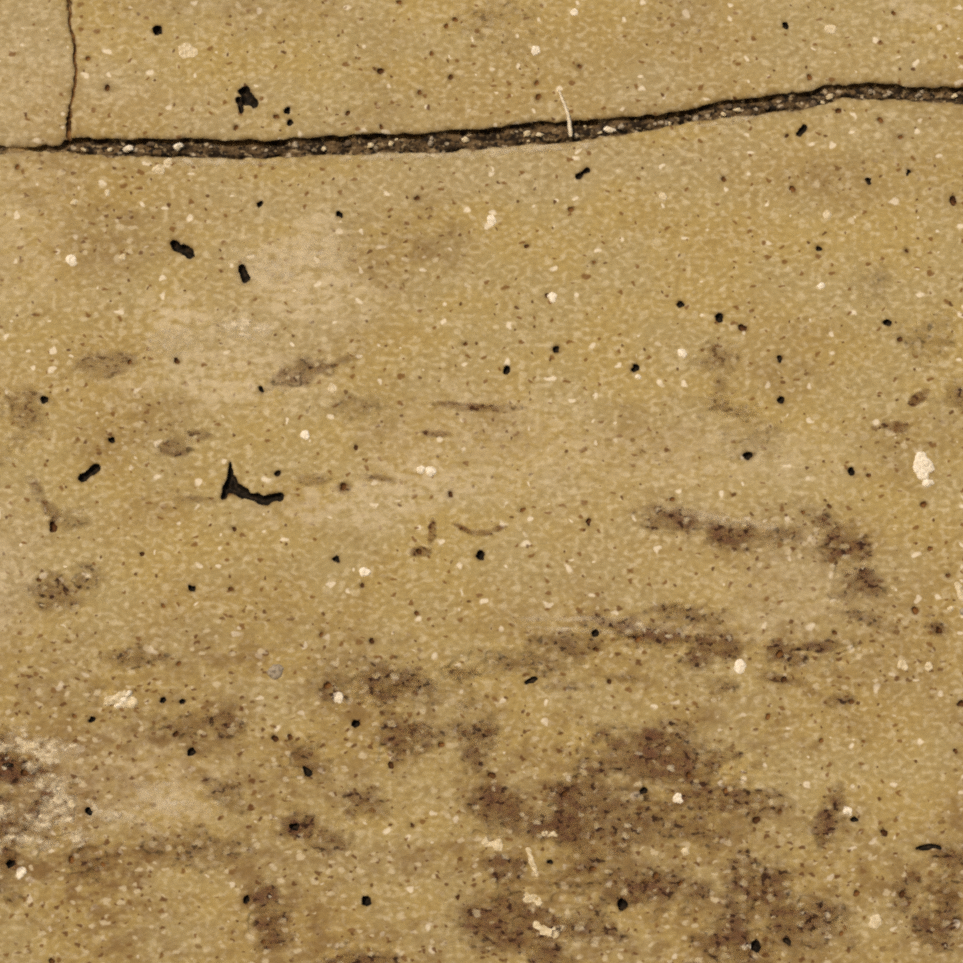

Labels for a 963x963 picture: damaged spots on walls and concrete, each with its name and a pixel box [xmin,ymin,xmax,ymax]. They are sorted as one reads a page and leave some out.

crack [0,0,963,160]
leakage [647,506,752,550]
leakage [824,533,883,596]
leakage [536,614,738,667]
leakage [768,640,835,665]
leakage [467,786,523,827]
leakage [526,721,782,845]
leakage [814,790,841,835]
leakage [460,897,625,963]
leakage [588,867,710,904]
leakage [704,849,844,963]
leakage [913,880,959,950]